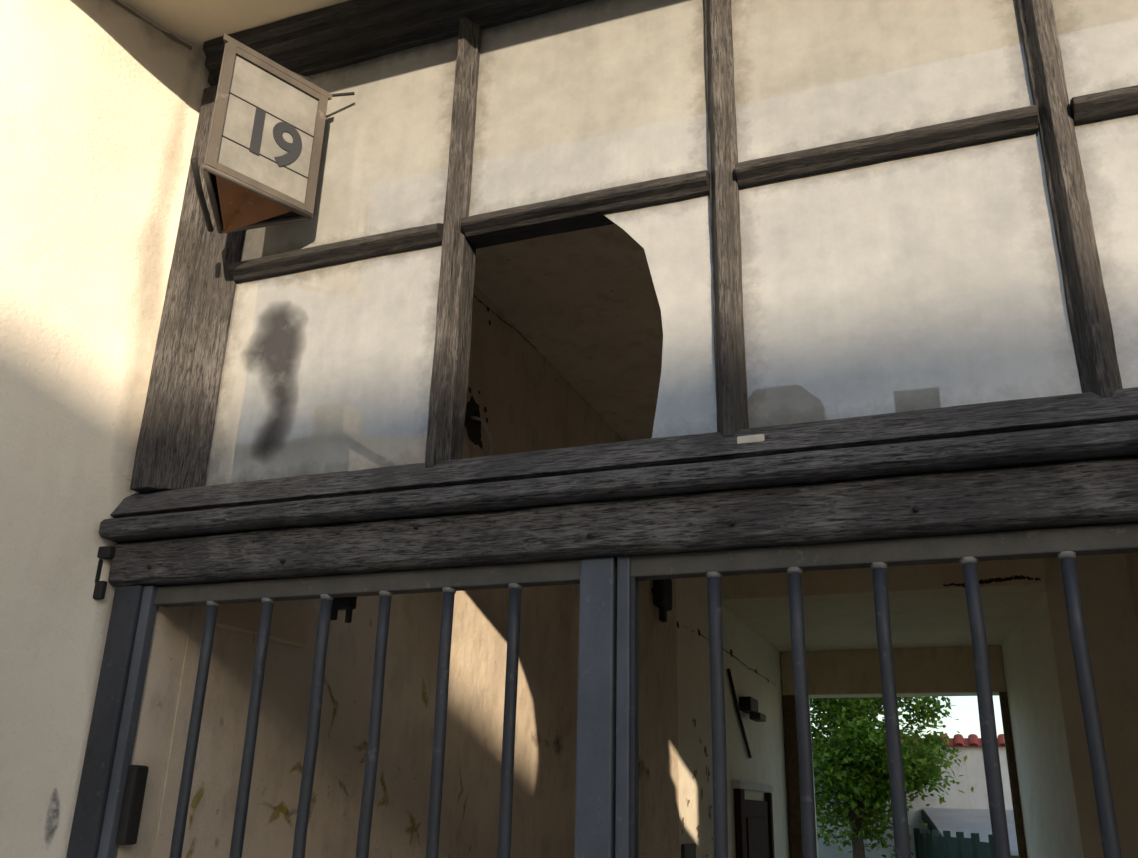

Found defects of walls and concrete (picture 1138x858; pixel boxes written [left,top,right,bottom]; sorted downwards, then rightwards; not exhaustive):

crack [943,575,1041,588]